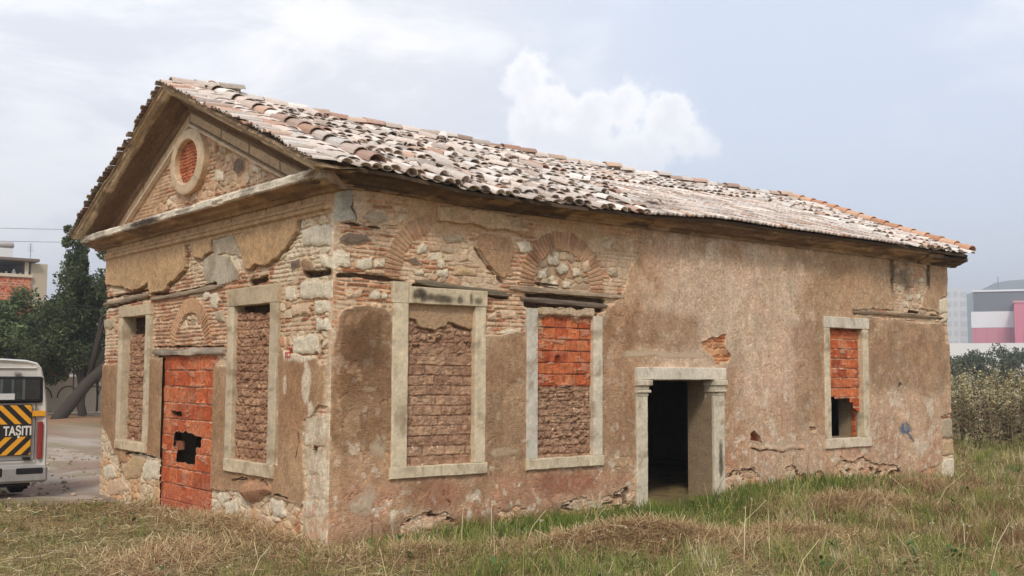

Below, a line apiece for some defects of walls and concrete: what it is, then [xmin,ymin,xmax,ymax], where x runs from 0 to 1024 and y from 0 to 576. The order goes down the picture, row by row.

flaking render [103,189,642,366]
flaking render [852,264,949,344]
flaking render [701,334,731,364]
flaking render [99,427,162,505]
flaking render [725,468,760,493]
flaking render [835,456,901,479]
flaking render [559,484,635,516]
flaking render [400,511,457,537]